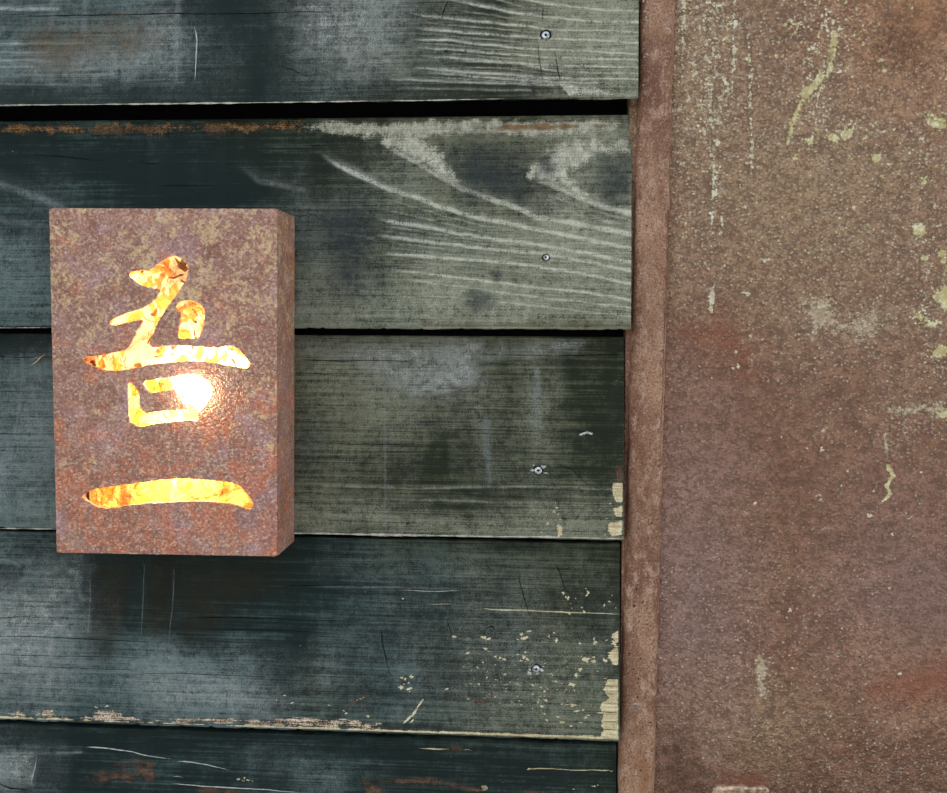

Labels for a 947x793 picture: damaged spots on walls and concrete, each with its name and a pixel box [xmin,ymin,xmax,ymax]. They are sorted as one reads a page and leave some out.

corrosion [2,123,189,134]
corrosion [202,121,302,133]
peeling [604,467,623,536]
peeling [0,630,642,739]